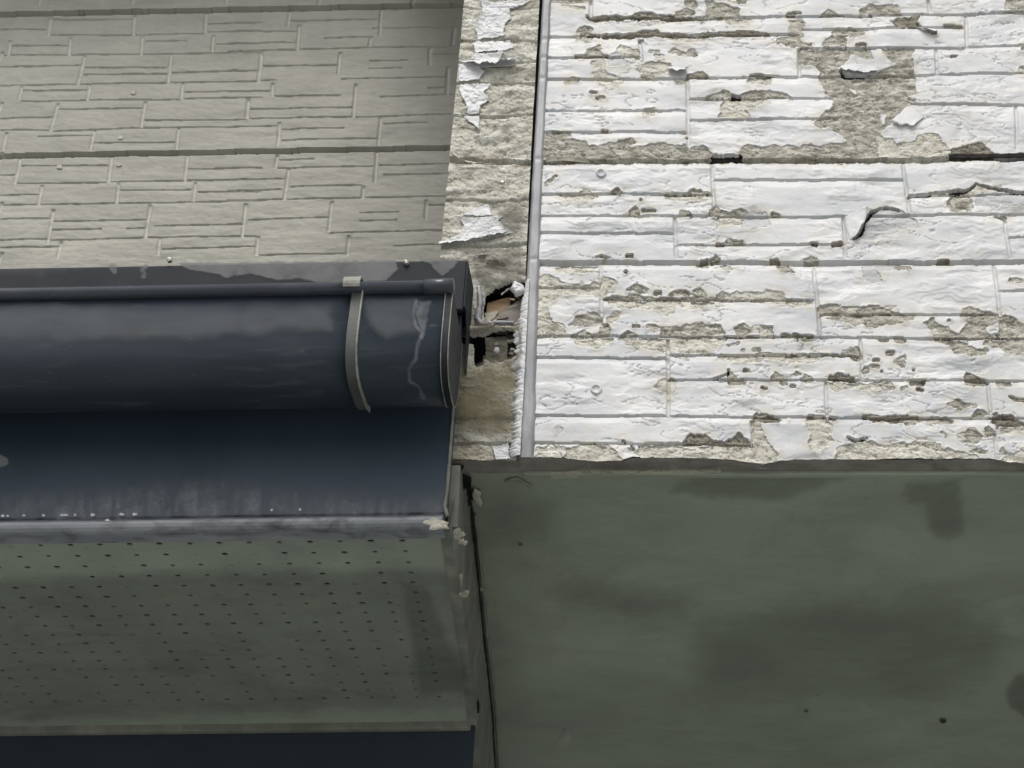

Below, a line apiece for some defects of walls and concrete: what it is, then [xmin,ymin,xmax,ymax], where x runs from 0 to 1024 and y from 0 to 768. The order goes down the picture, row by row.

peeling [458,0,530,131]
peeling [543,0,1024,201]
peeling [439,204,513,247]
peeling [696,239,746,273]
peeling [664,190,780,230]
peeling [769,205,917,274]
spalling [460,281,525,388]
peeling [537,256,1024,393]
peeling [492,443,510,460]
peeling [535,427,623,461]
peeling [680,413,780,465]
peeling [805,399,1024,463]